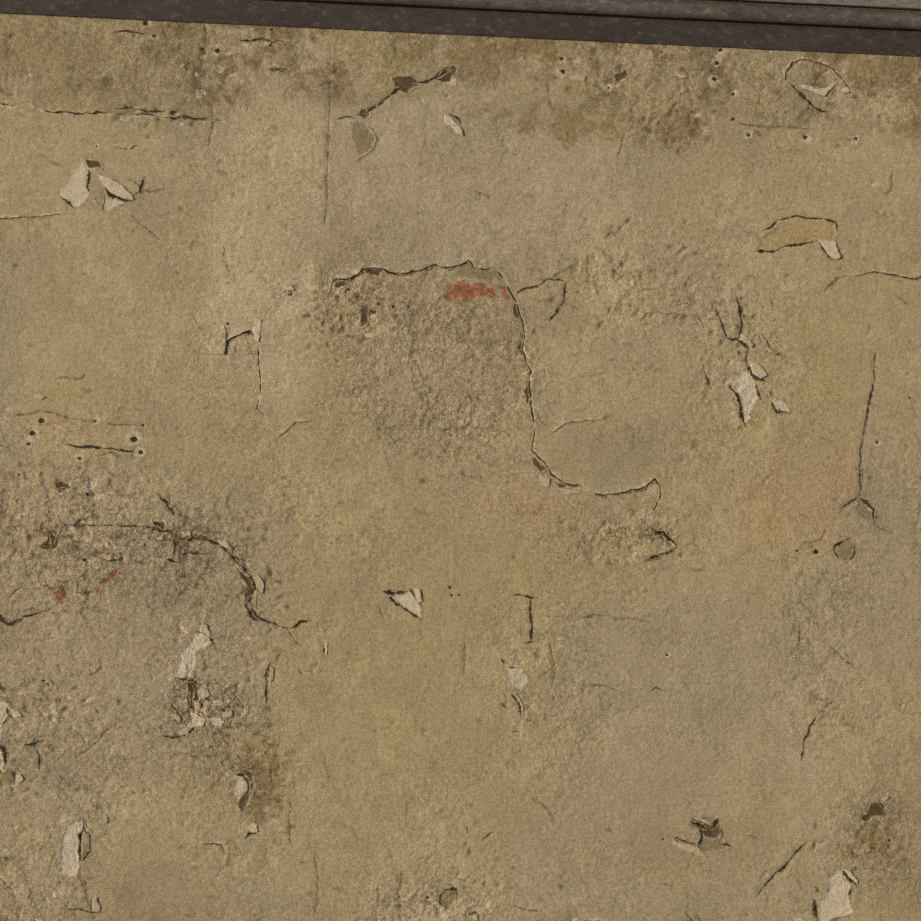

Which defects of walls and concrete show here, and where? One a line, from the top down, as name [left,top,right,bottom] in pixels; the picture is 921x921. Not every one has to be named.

crack [357,64,460,121]
peeling [54,157,164,213]
crack [824,275,846,291]
peeling [715,295,791,427]
crack [841,352,891,533]
crack [151,493,310,647]
crack [0,587,64,628]
peeling [382,588,423,644]
peeling [161,623,249,740]
peeling [57,818,101,914]
crack [756,842,806,897]
peeling [794,868,858,921]